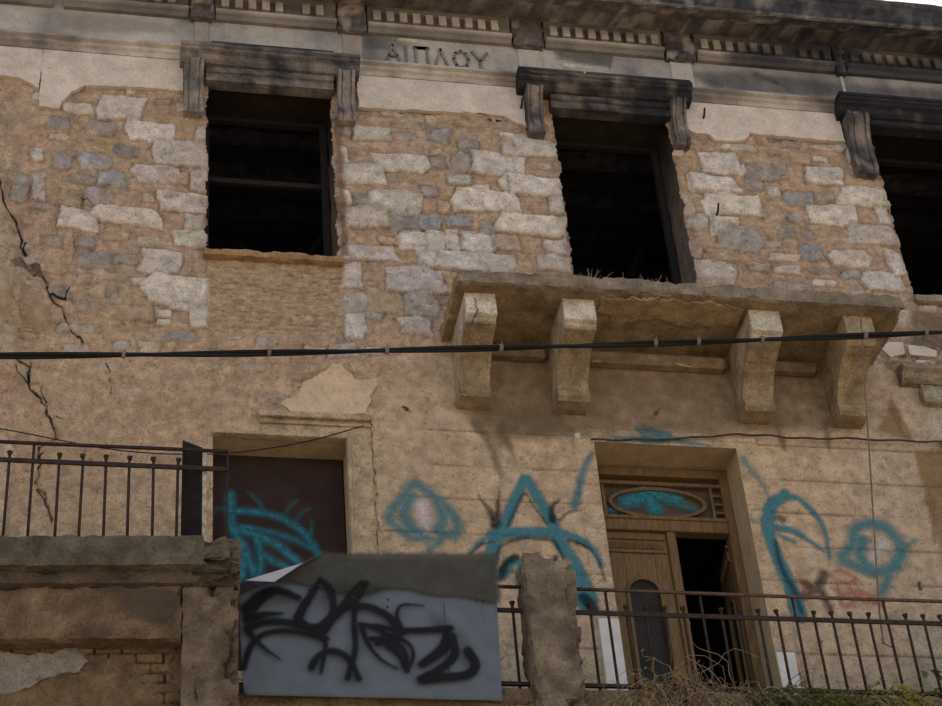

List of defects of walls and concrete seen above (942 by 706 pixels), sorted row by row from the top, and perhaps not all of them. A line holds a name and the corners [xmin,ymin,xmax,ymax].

spalling [13,256,43,277]
crack [0,180,83,343]
peeling [281,363,378,415]
crack [16,359,62,521]
peeling [0,648,88,695]